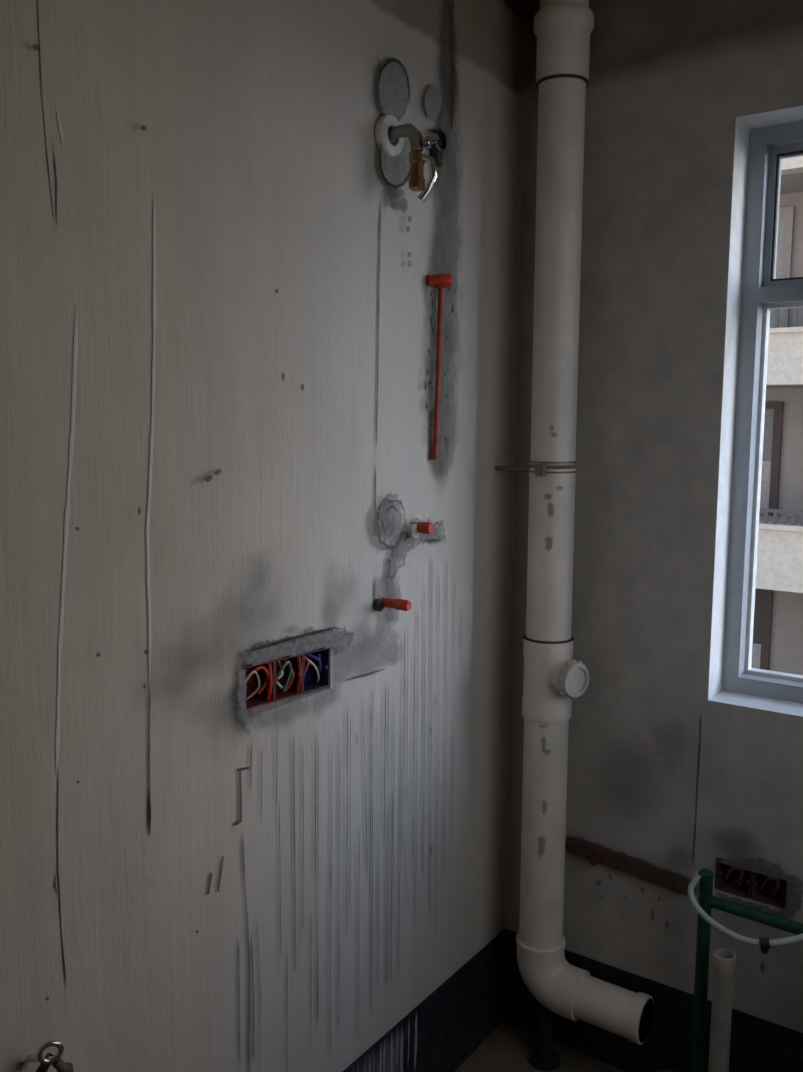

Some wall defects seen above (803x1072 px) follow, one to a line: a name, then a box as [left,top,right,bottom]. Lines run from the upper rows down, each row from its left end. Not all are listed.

crack [37,0,57,225]
crack [53,779,66,986]